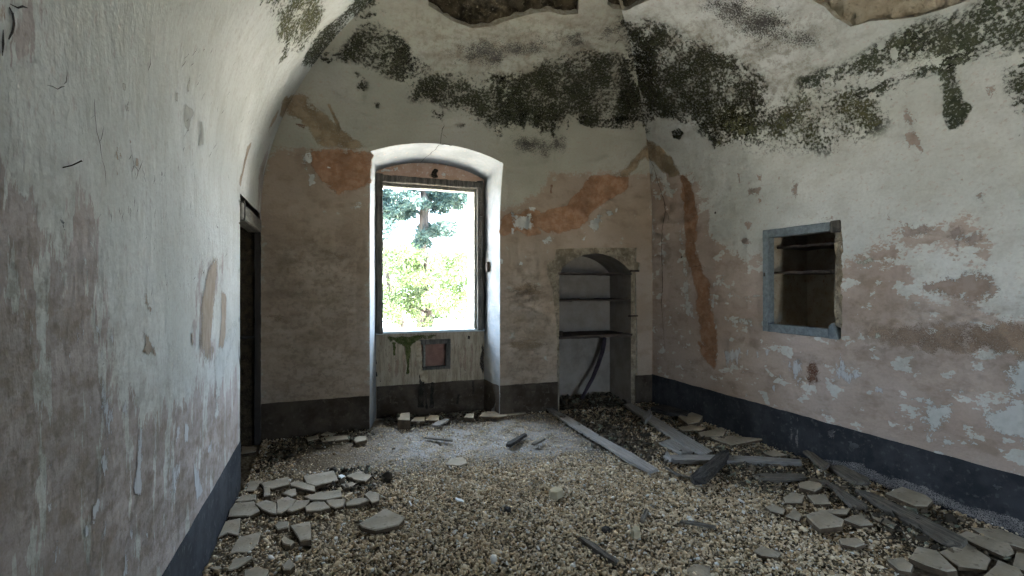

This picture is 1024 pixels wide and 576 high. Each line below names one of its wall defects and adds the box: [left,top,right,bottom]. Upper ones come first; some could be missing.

spalling [428,0,579,28]
spalling [813,0,966,27]
damp [260,0,1024,370]
peeling [511,207,536,234]
peeling [887,214,928,237]
peeling [947,225,988,246]
peeling [920,269,1000,306]
peeling [143,333,156,356]
peeling [191,257,237,419]
damp [392,342,434,409]
peeling [983,356,1024,446]
peeling [910,397,953,457]